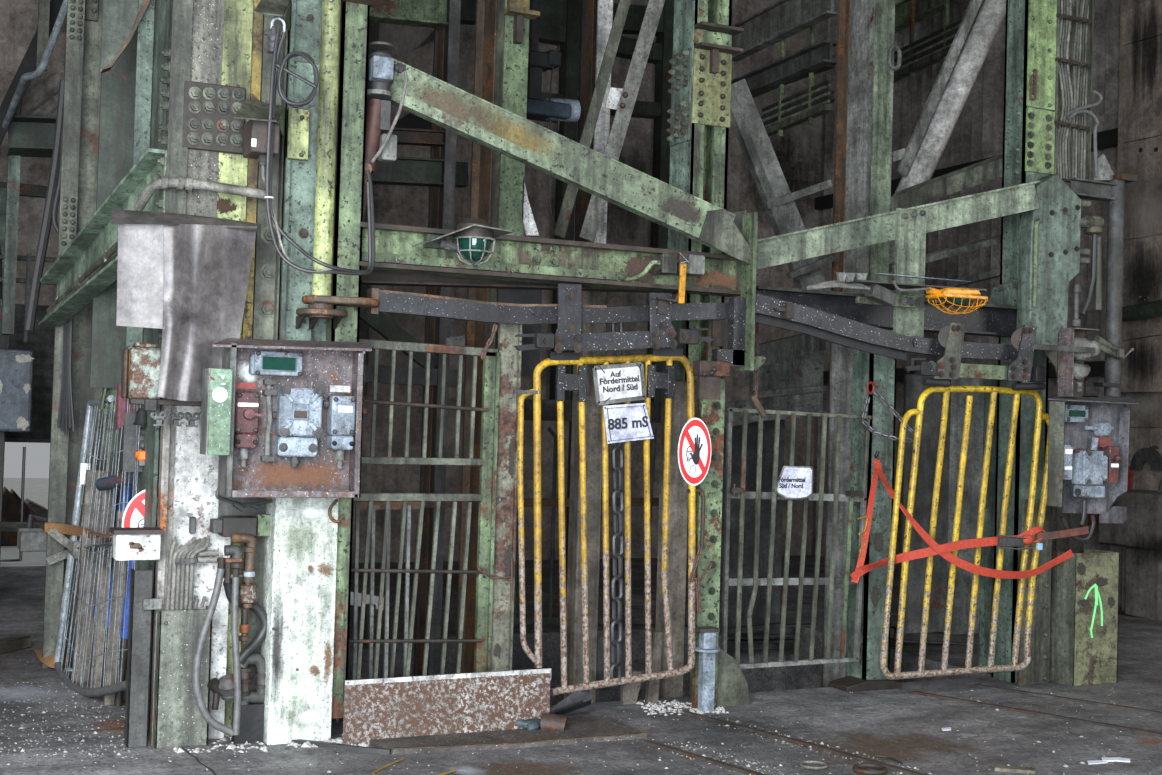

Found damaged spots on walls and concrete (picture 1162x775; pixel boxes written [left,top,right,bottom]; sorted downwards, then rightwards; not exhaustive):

rust [415,0,501,132]
rust [583,0,594,127]
rust [840,0,850,222]
rust [478,144,492,223]
rust [580,190,589,242]
rust [664,197,700,222]
rust [245,460,349,489]
rust [464,322,487,673]
rust [308,564,331,576]
rust [418,508,429,676]
rust [310,643,332,679]
crack [182,747,217,775]